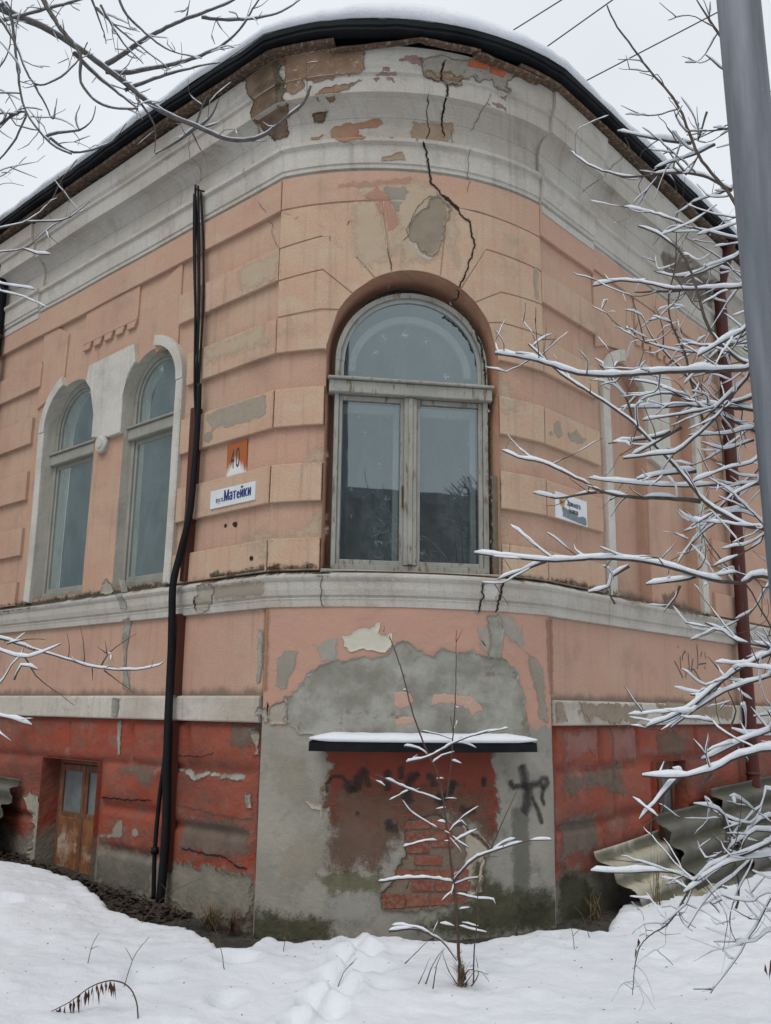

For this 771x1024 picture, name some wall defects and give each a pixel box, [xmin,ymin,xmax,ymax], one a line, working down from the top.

spalling [242,49,517,143]
peeling [381,151,405,161]
peeling [341,177,453,266]
crack [387,60,504,615]
peeling [206,394,266,431]
peeling [194,582,264,614]
peeling [342,622,392,653]
peeling [393,691,417,726]
peeling [431,693,484,716]
peeling [501,614,733,726]
spalling [23,791,39,861]
spalling [380,813,490,912]